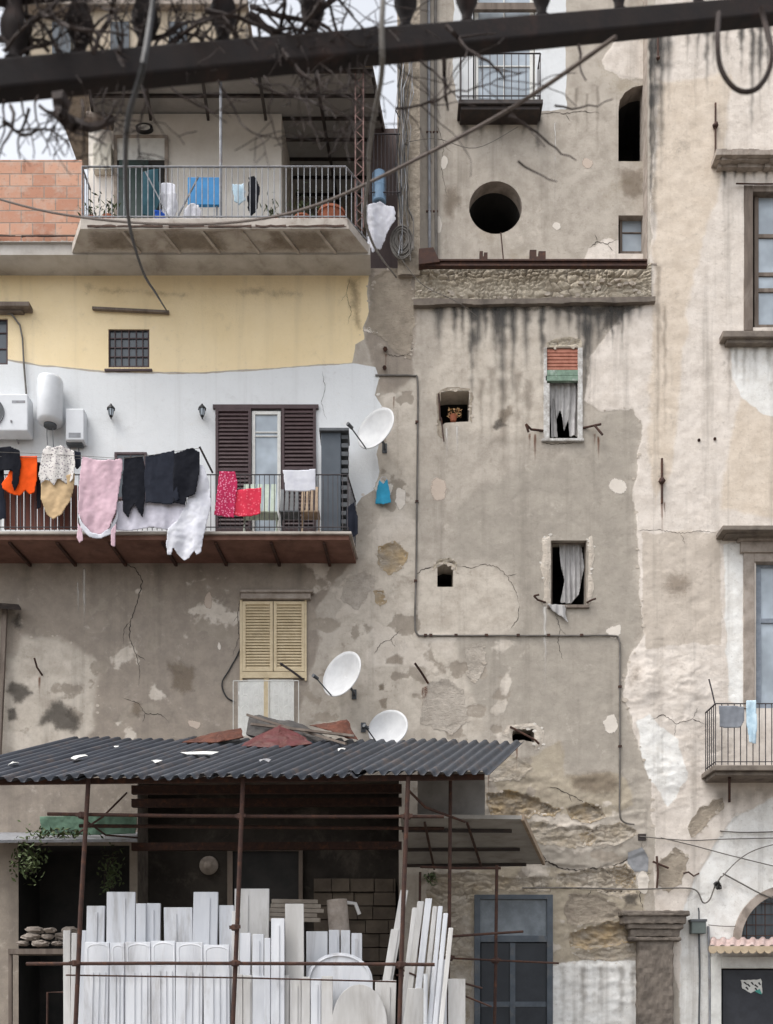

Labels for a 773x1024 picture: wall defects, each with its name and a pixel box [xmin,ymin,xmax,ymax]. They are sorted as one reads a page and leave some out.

water stain [649,37,671,146]
spalling [363,263,652,360]
water stain [434,305,632,358]
spalling [340,540,408,610]
crack [123,564,166,719]
spalling [502,722,545,750]
spalling [485,755,656,849]
spalling [426,863,637,1022]